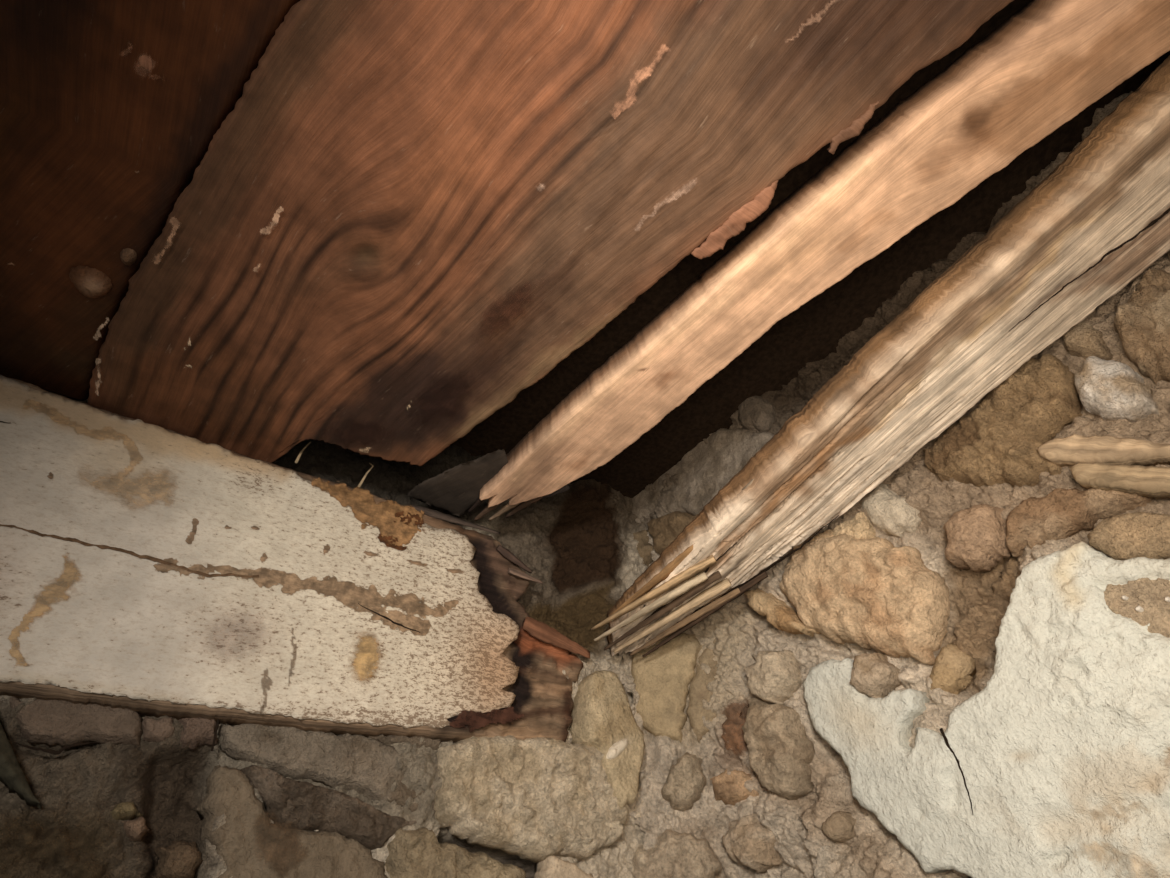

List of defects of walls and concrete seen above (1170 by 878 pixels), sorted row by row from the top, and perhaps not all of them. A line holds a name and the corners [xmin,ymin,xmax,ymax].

crack [0,524,459,636]
crack [940,728,973,814]